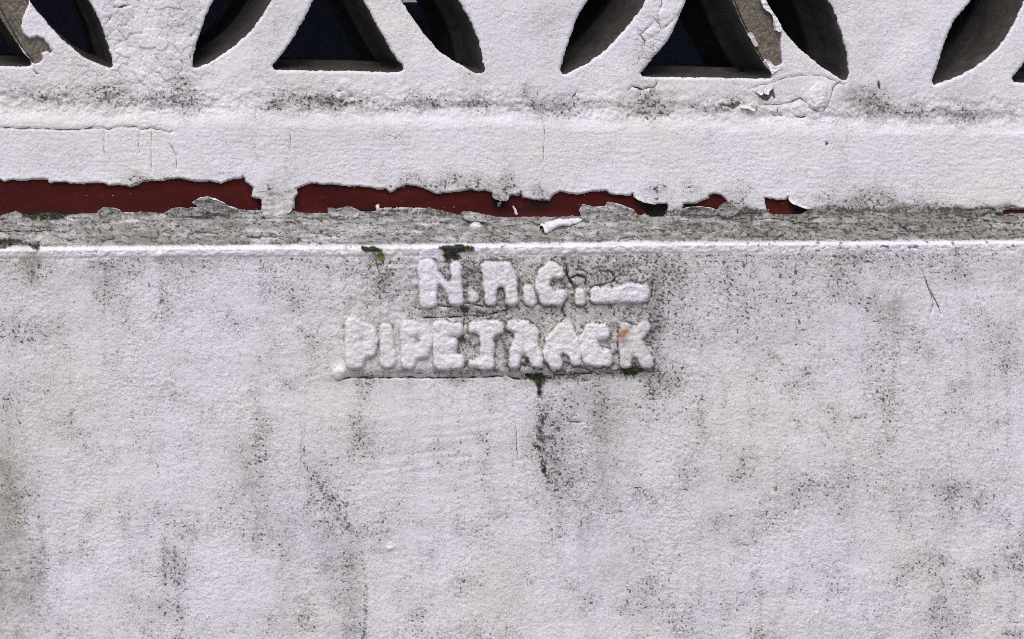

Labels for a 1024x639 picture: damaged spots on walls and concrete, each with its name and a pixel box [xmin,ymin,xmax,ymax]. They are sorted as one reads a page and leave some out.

peeling [0,0,52,74]
peeling [723,87,775,111]
peeling [0,178,668,227]
peeling [683,194,738,217]
peeling [765,197,811,215]
peeling [962,209,1024,222]
water stain [523,358,576,491]